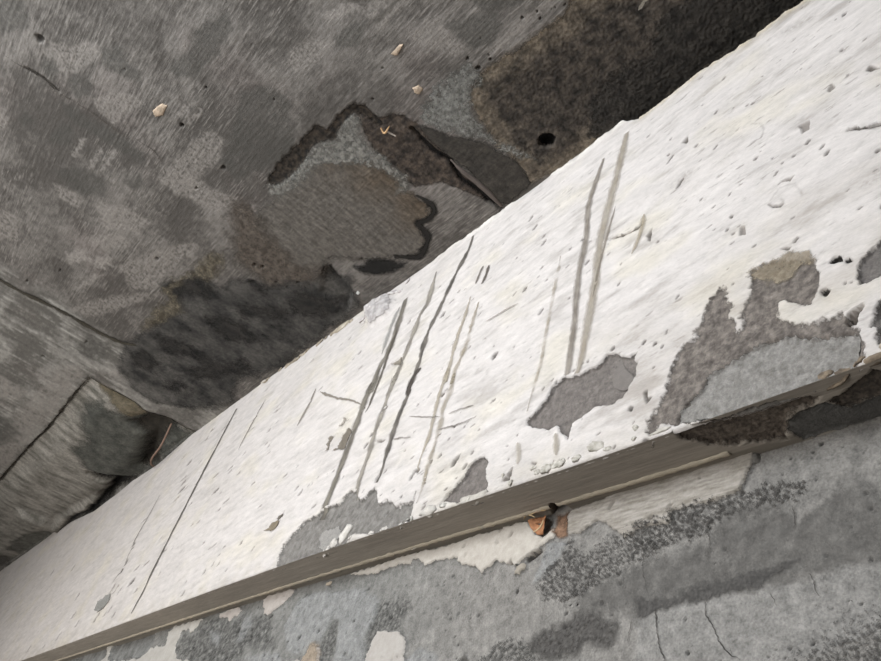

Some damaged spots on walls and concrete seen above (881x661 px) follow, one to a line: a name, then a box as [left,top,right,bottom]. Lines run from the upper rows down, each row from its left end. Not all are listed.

spalling [268,103,488,201]
leakage [419,0,803,204]
leakage [119,114,437,410]
leakage [320,235,479,520]
spalling [527,354,637,438]
leakage [565,132,628,376]
spalling [631,250,881,445]
spalling [830,241,881,285]
spalling [277,457,488,570]
corrosion [552,512,569,538]
peeling [567,452,753,538]
leakage [478,480,881,661]